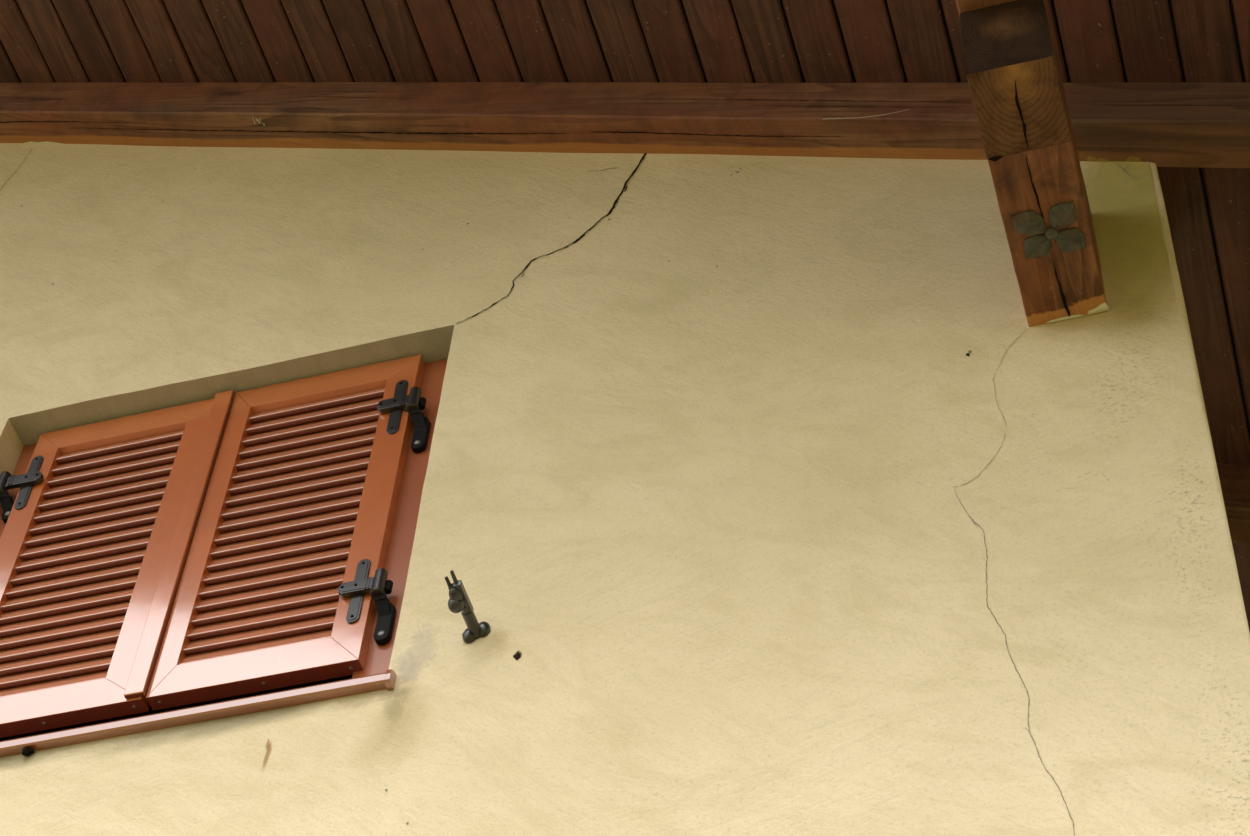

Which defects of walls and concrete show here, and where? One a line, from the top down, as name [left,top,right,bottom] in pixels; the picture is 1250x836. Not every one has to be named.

crack [456,99,944,324]
crack [954,331,1075,836]